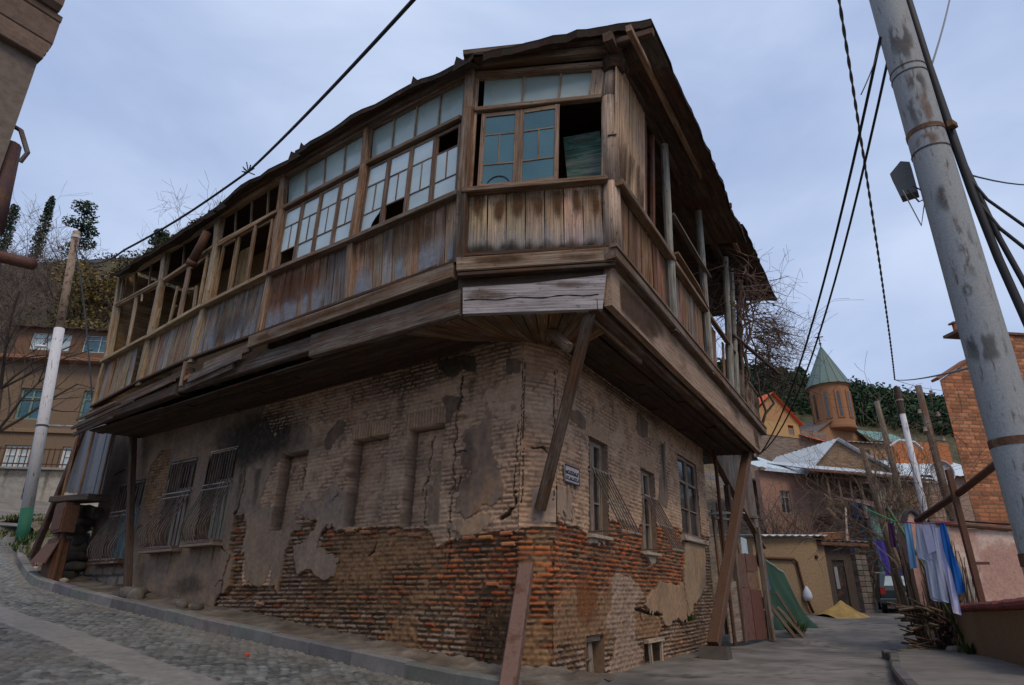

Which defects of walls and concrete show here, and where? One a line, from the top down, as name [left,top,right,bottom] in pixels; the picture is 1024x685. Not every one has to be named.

damp [222,410,292,477]
crack [414,375,467,572]
spalling [216,409,715,673]
crack [498,362,557,520]